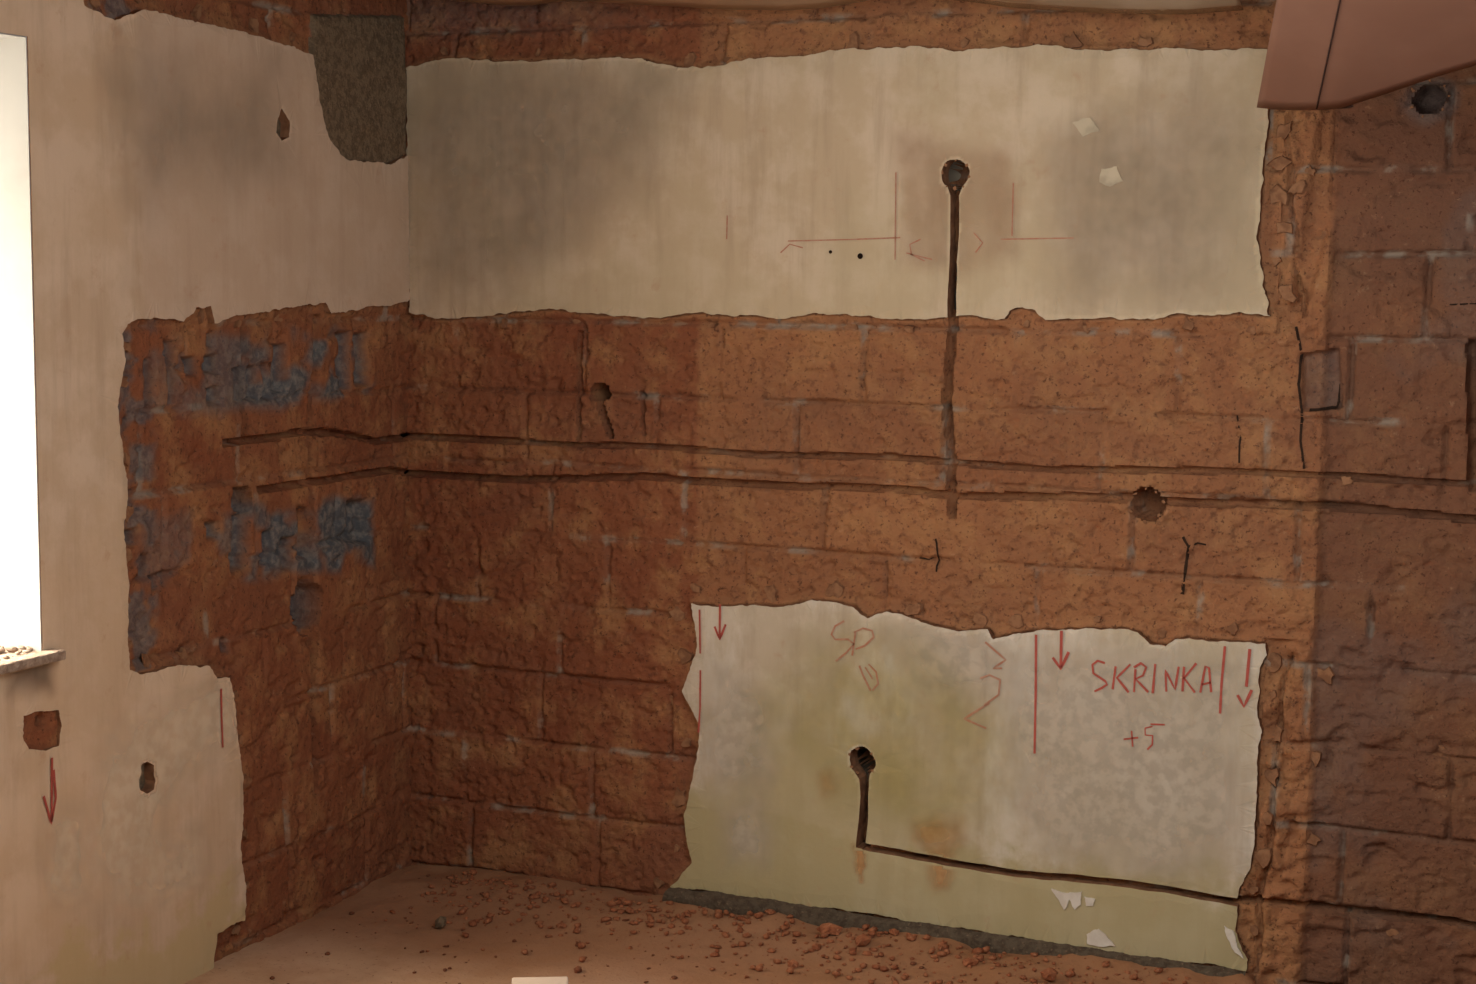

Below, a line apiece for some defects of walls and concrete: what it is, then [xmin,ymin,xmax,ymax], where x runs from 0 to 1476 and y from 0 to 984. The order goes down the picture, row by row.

flaking render [83,0,1277,71]
spalling [941,160,971,191]
flaking render [952,65,1476,480]
flaking render [118,300,1476,962]
flaking render [23,710,58,750]